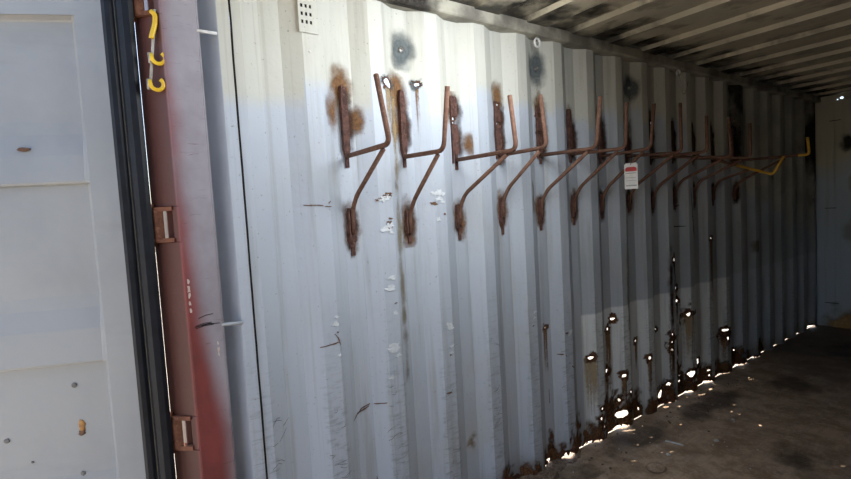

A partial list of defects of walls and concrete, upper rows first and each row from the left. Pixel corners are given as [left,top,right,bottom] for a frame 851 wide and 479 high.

corrosion [327,67,364,139]
corrosion [380,75,423,147]
corrosion [448,95,474,155]
corrosion [492,85,505,150]
corrosion [566,118,577,160]
corrosion [598,122,607,161]
corrosion [403,205,416,245]
corrosion [502,252,762,479]